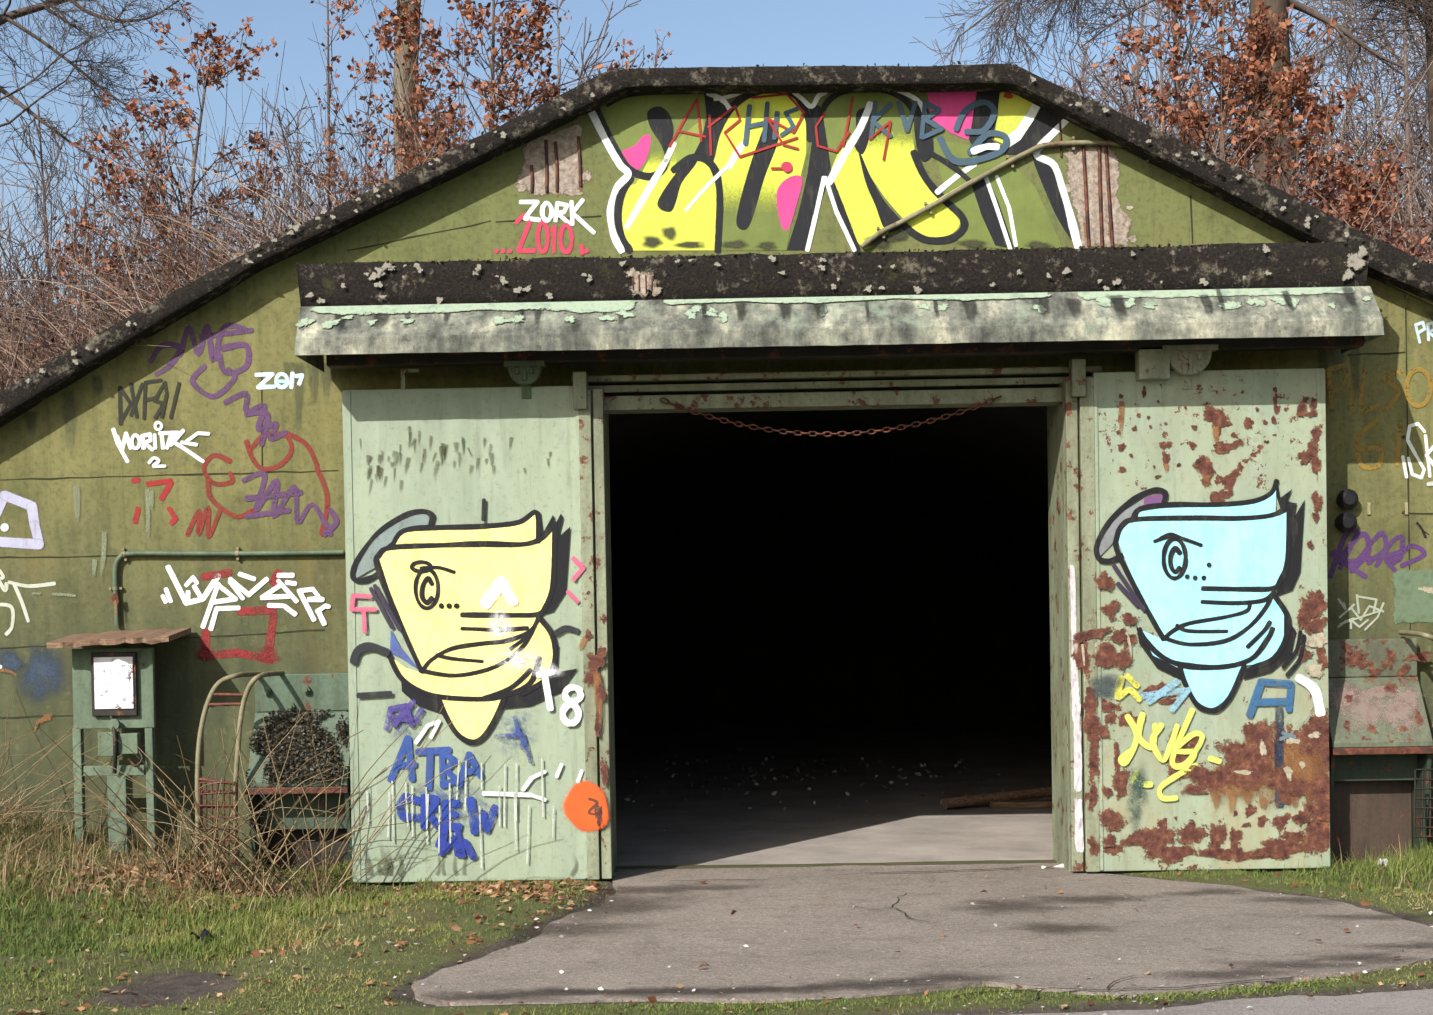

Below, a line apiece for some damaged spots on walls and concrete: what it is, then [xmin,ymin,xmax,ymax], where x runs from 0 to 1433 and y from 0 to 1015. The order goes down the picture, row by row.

spalling [514,124,592,197]
spalling [1059,121,1137,248]
peeling [294,267,1053,329]
rust [1116,386,1323,522]
rust [1296,589,1433,678]
rust [579,629,607,737]
rust [1071,570,1330,866]
rust [594,803,603,828]
rust [599,757,609,786]
crack [948,975,1301,1003]